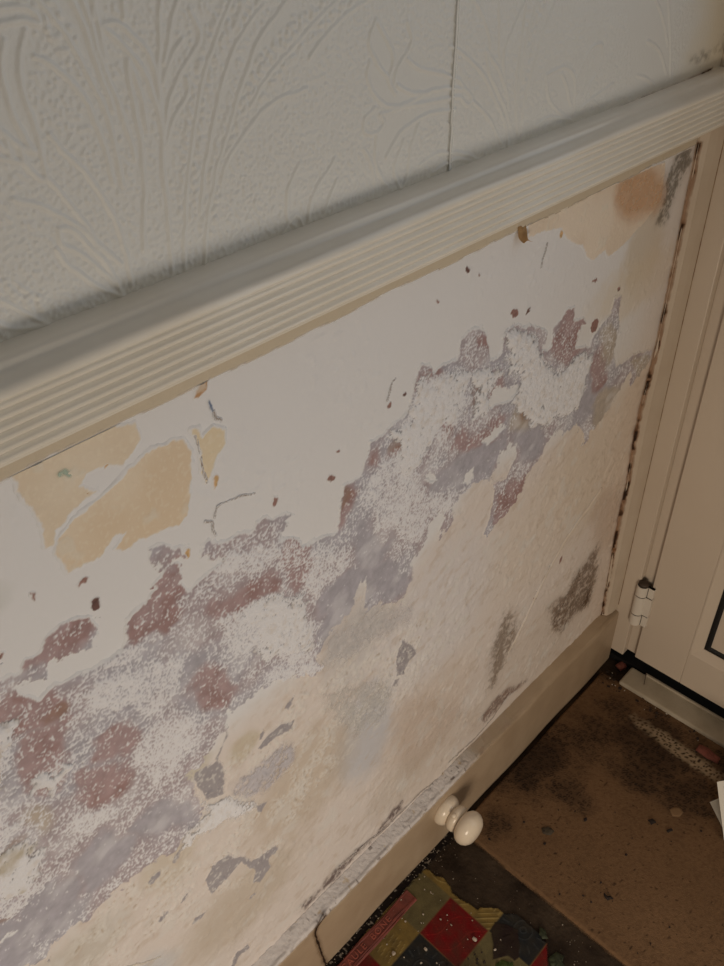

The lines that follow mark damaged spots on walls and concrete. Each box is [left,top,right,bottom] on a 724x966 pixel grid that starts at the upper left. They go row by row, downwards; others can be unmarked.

flaking render [0,286,653,966]
damp [492,620,513,683]
damp [484,684,521,720]
damp [554,553,596,627]
damp [182,746,294,849]
damp [252,746,480,966]